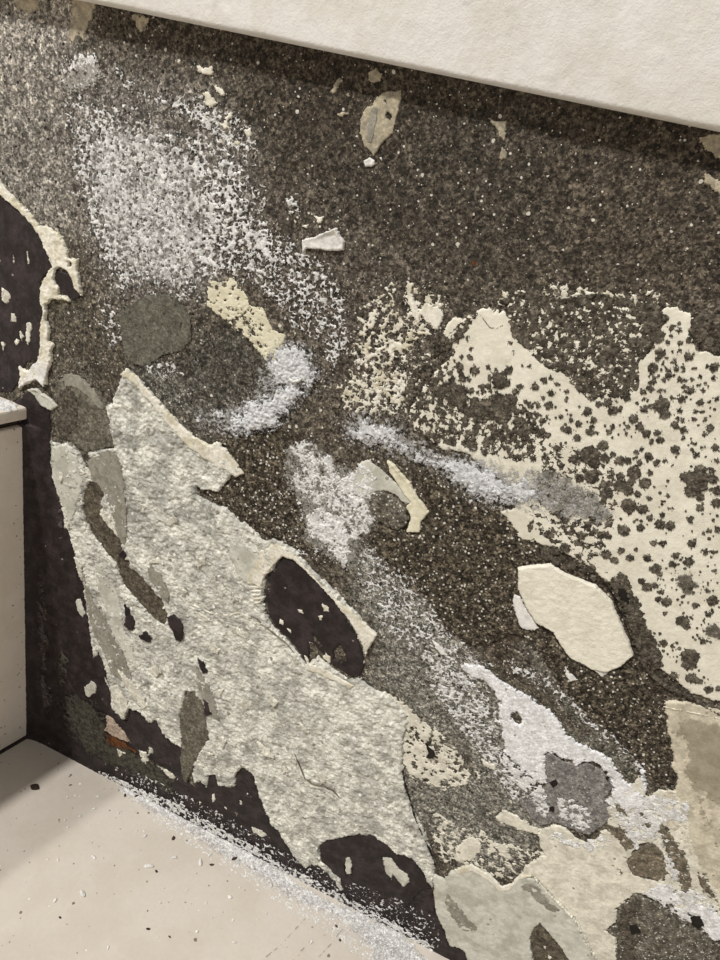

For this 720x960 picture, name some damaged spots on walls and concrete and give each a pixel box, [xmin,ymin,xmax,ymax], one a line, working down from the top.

peeling [0,179,83,393]
damp [143,351,184,380]
damp [61,51,349,370]
damp [37,582,440,952]
peeling [15,368,720,960]
peeling [360,68,402,167]
damp [193,290,720,941]
peeling [336,276,720,701]